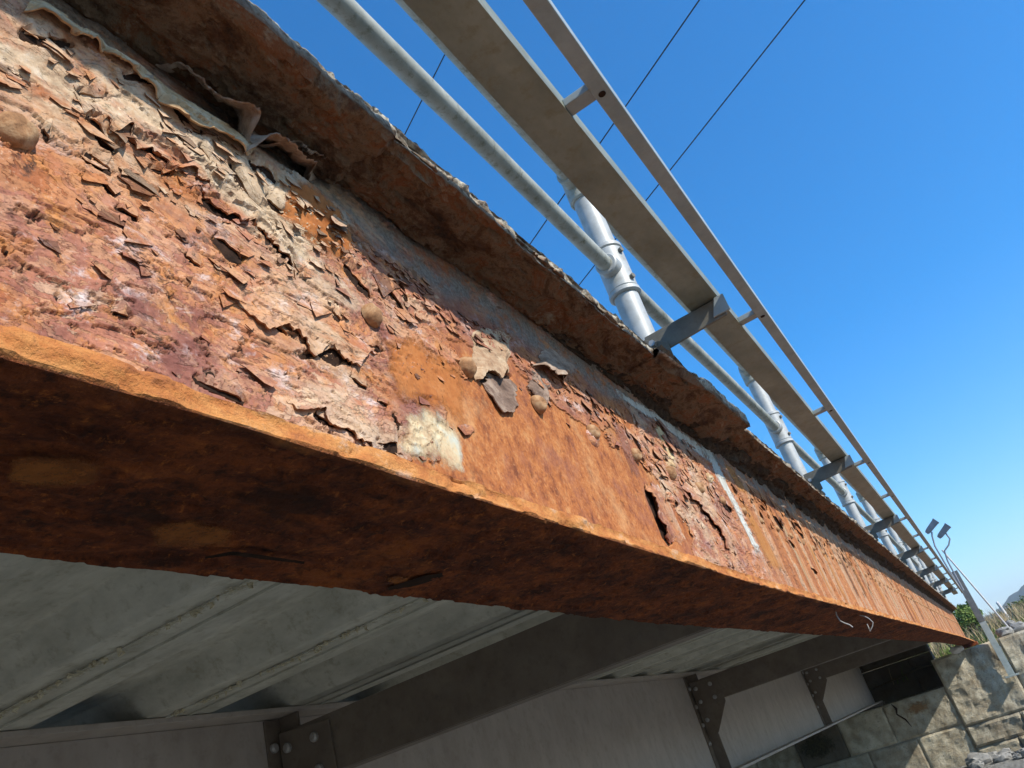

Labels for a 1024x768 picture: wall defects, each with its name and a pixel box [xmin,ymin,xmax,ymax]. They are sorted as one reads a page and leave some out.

peeling [18,0,575,453]
corrosion [10,458,101,485]
corrosion [153,522,230,547]
peeling [654,458,745,554]
corrosion [528,318,959,631]